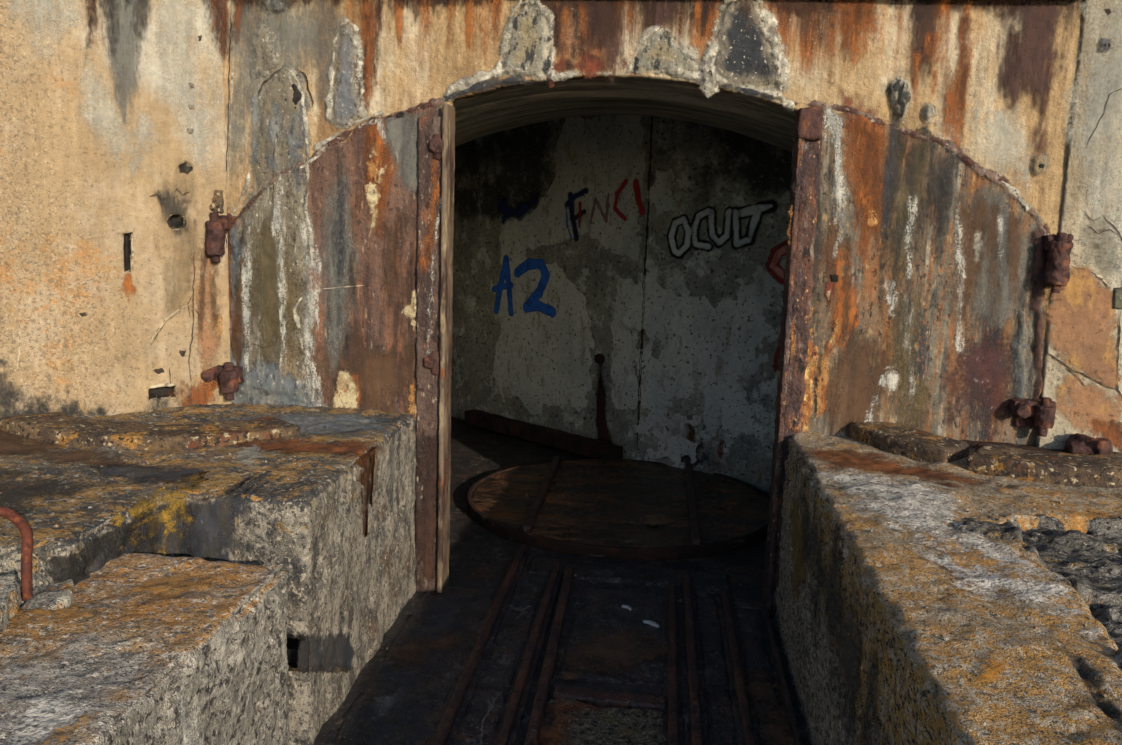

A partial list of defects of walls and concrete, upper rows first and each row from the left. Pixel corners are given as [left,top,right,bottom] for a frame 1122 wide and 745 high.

leakage [83,0,206,171]
rust [203,0,264,57]
rust [357,0,502,108]
rust [520,0,750,86]
rust [891,0,1079,151]
crack [1086,88,1122,148]
peeling [364,151,384,228]
rust [309,116,442,417]
rust [824,96,888,433]
crack [1085,211,1122,239]
peeling [333,370,361,408]
crack [1044,318,1122,396]